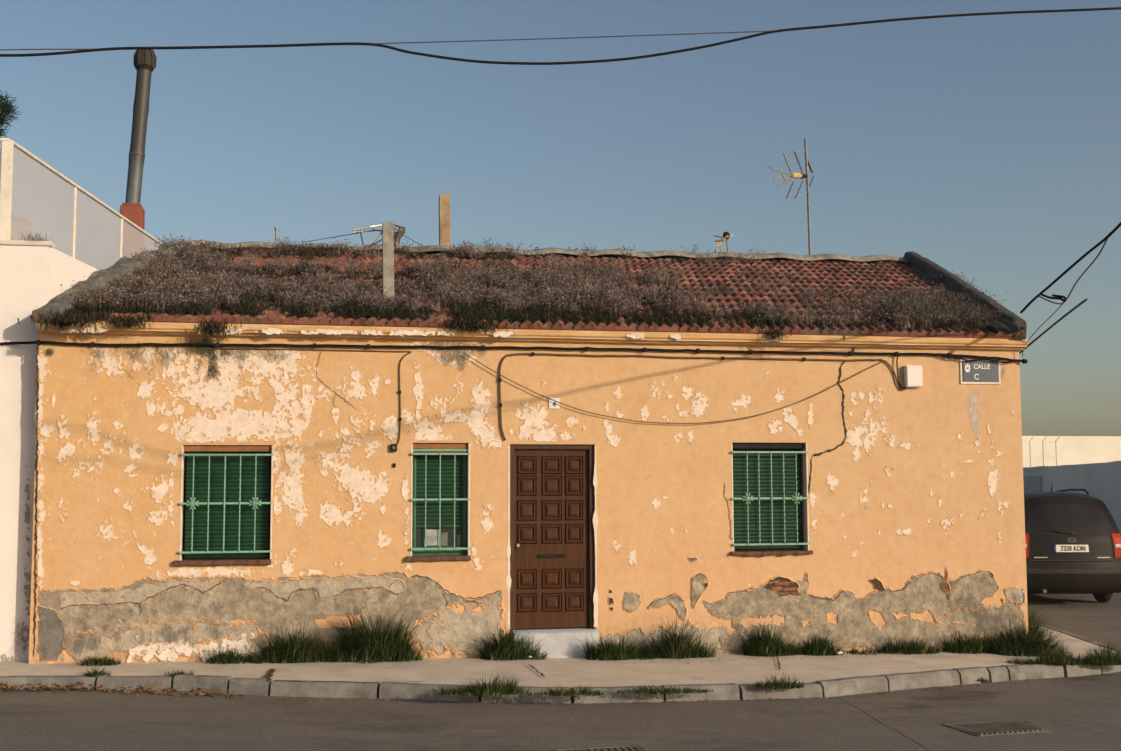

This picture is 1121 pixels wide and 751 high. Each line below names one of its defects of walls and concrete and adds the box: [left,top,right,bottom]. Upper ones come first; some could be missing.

peeling [602,385,626,448]
peeling [639,372,709,445]
peeling [731,394,755,413]
peeling [764,370,821,440]
crack [808,335,855,495]
peeling [845,385,920,462]
flaking render [2,327,587,663]
peeling [809,472,839,530]
peeling [927,424,1010,536]
peeling [612,539,638,567]
flaking render [600,556,1027,654]